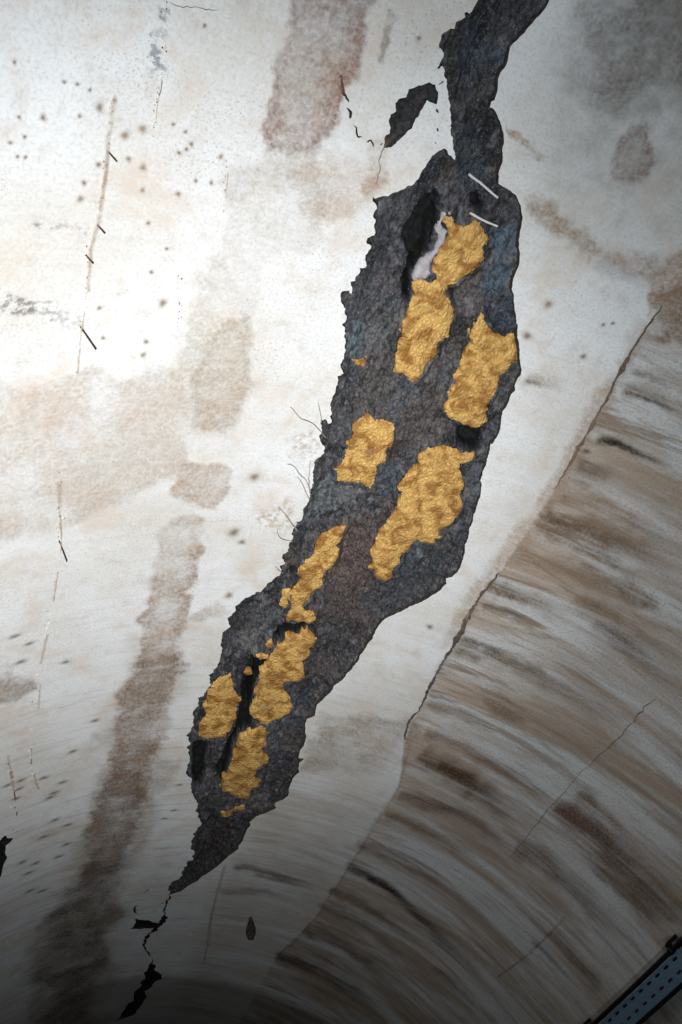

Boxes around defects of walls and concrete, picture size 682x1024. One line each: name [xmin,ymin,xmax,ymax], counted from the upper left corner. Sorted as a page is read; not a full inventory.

spalling [168,0,549,895]
crack [554,306,662,489]
crack [404,573,499,740]
leakage [35,740,158,1024]
crack [133,890,171,957]